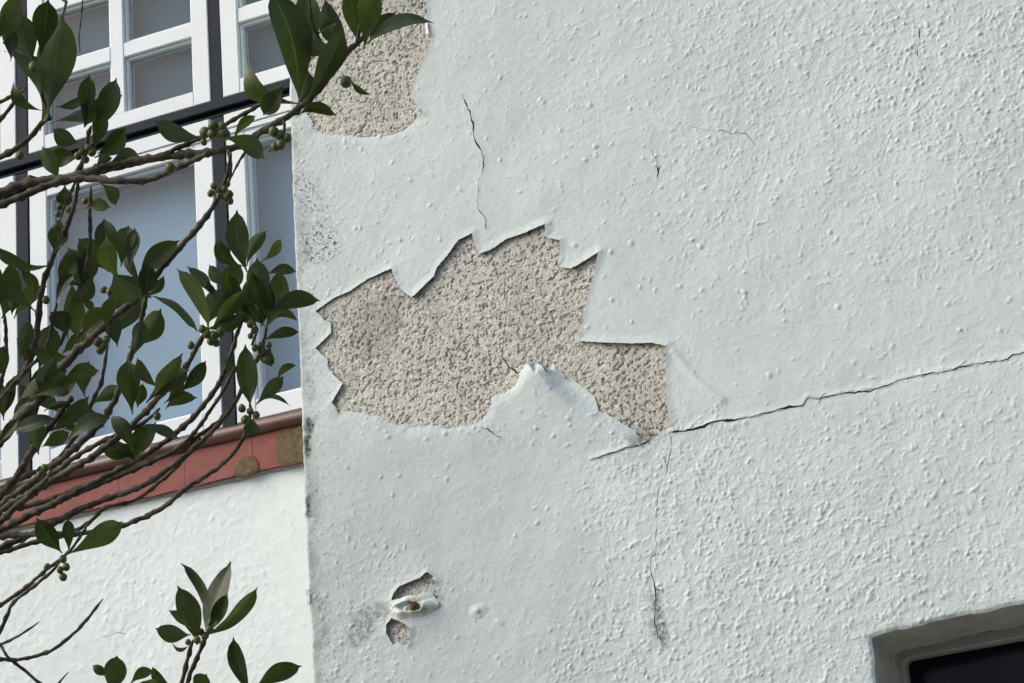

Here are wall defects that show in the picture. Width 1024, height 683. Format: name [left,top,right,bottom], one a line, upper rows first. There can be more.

peeling [304,0,431,137]
crack [462,97,486,228]
peeling [316,224,670,444]
crack [596,352,1024,644]
spalling [386,618,411,645]
spalling [391,572,439,601]